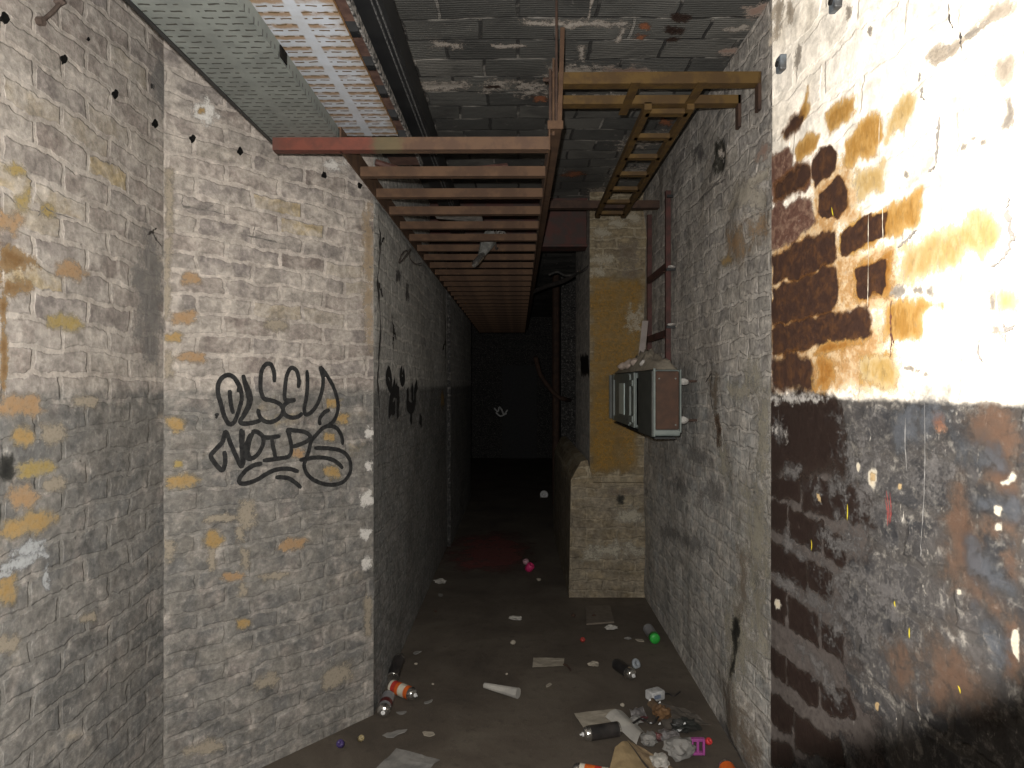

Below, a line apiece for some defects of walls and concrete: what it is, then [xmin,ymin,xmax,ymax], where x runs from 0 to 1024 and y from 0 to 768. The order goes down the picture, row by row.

peeling [890,284,934,298]